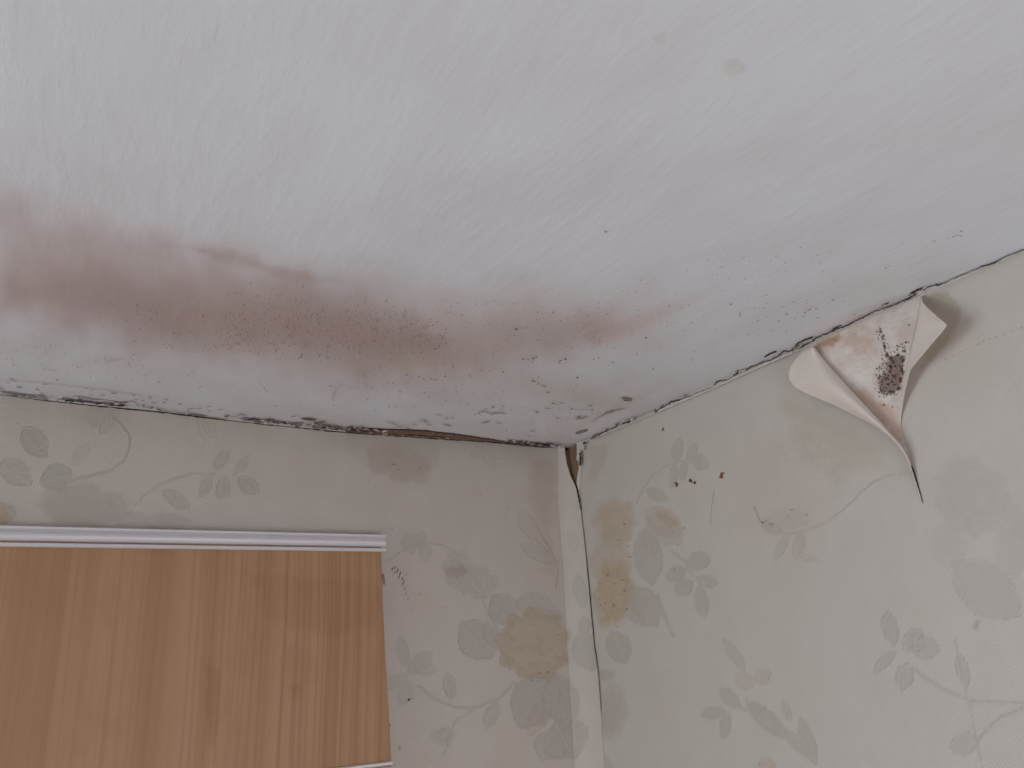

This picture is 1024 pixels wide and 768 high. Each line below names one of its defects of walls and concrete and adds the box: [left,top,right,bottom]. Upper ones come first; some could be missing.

crack [0,394,554,448]
crack [591,250,1023,439]
flaking render [658,251,1024,473]
crack [581,514,601,703]